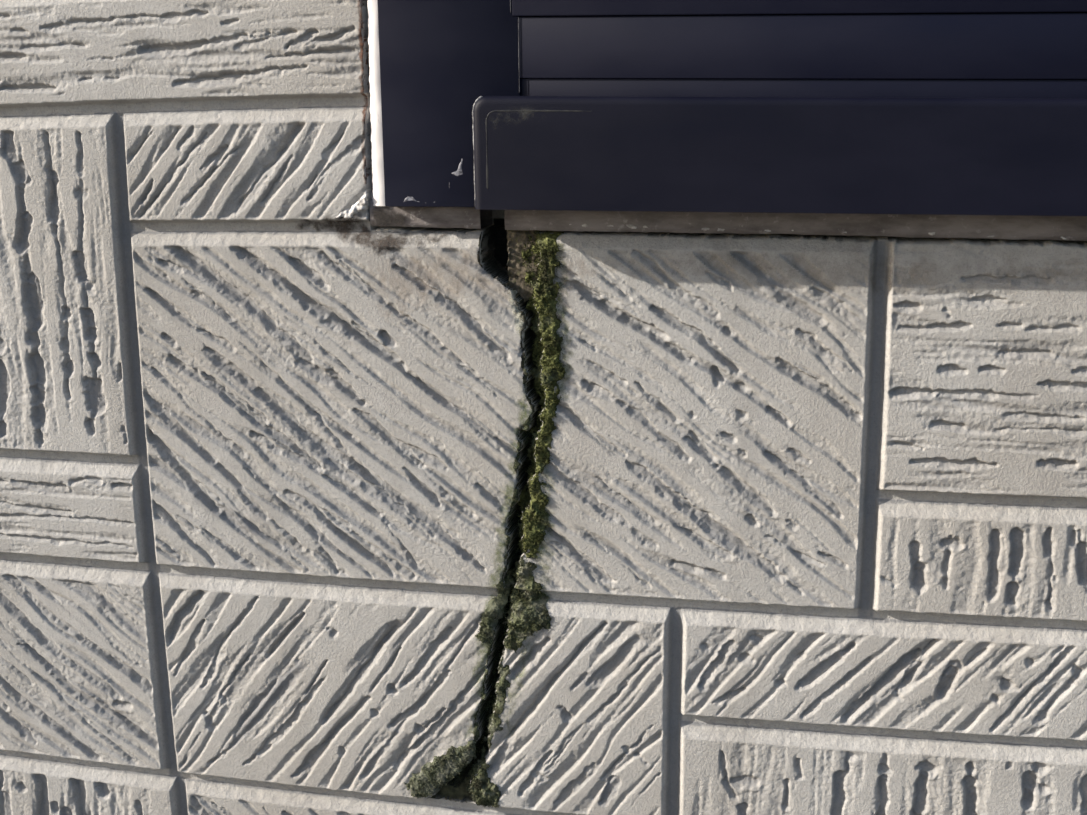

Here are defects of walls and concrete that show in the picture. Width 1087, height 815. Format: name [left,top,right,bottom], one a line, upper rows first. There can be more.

crack [404,219,566,809]
leakage [510,290,523,330]